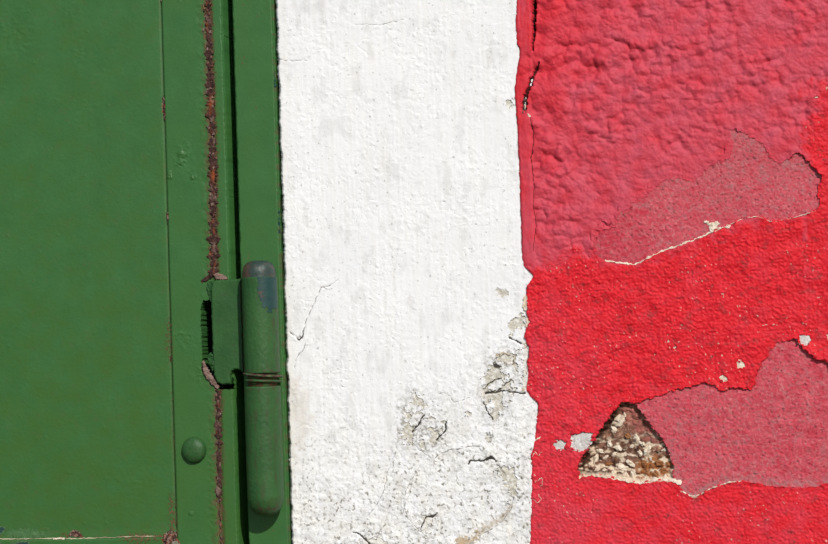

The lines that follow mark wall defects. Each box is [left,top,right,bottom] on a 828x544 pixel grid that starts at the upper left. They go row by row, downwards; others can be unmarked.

corrosion [203,0,221,274]
crack [522,0,539,249]
peeling [593,129,822,265]
corrosion [201,360,225,544]
spalling [397,393,447,451]
spalling [480,295,530,421]
peeling [577,335,828,499]
peeling [0,526,163,544]
corrosion [125,498,180,544]